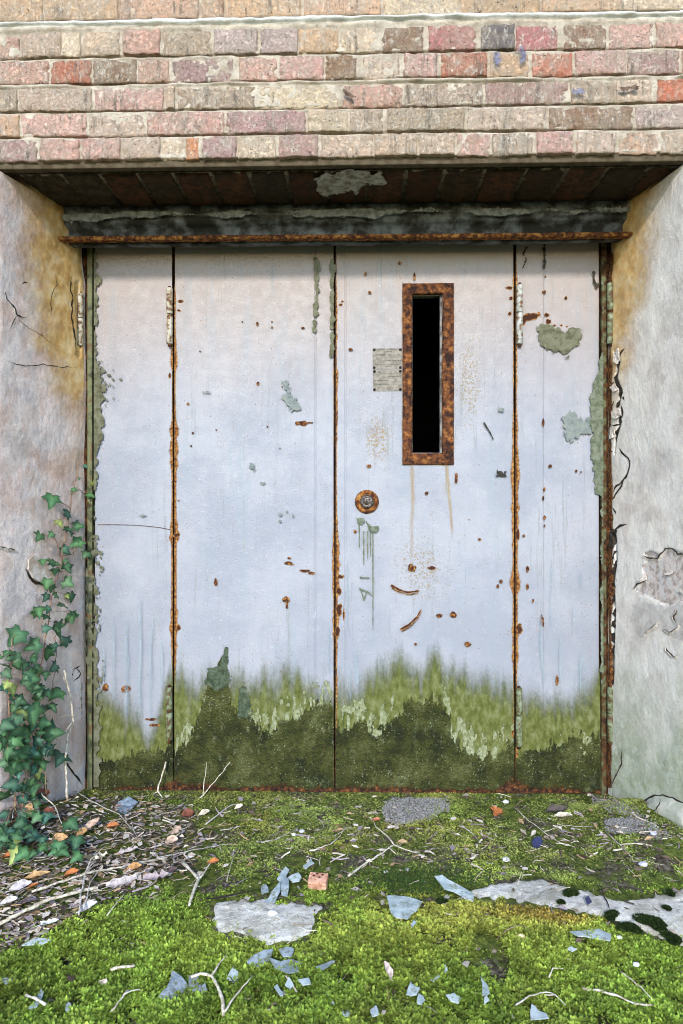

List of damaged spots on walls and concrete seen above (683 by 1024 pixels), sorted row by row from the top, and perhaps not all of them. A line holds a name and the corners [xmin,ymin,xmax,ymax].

crack [4,277,76,368]
leakage [30,186,84,400]
peeling [536,323,583,358]
corrosion [168,285,194,679]
corrosion [332,264,353,728]
corrosion [389,530,457,618]
corrosion [496,262,568,758]
peeling [561,352,603,565]
crack [609,348,630,683]
spalling [633,548,683,659]